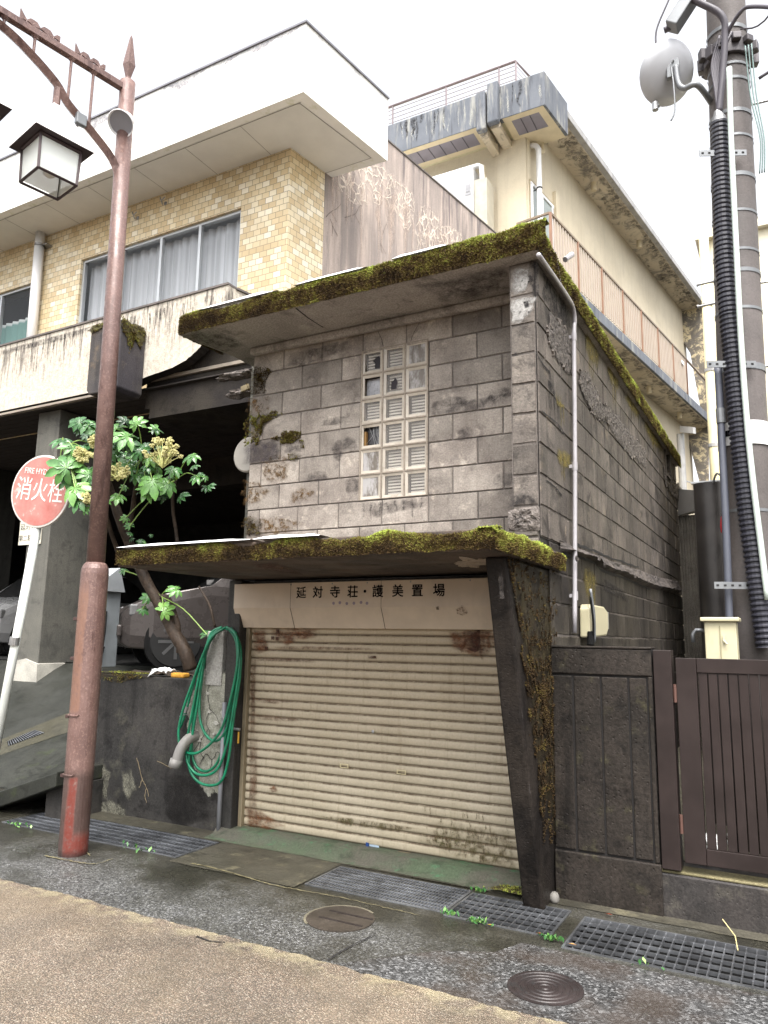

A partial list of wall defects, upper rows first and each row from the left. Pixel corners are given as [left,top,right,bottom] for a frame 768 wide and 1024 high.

spalling [216,369,252,400]
corrosion [255,629,312,661]
corrosion [452,630,494,654]
corrosion [248,809,271,829]